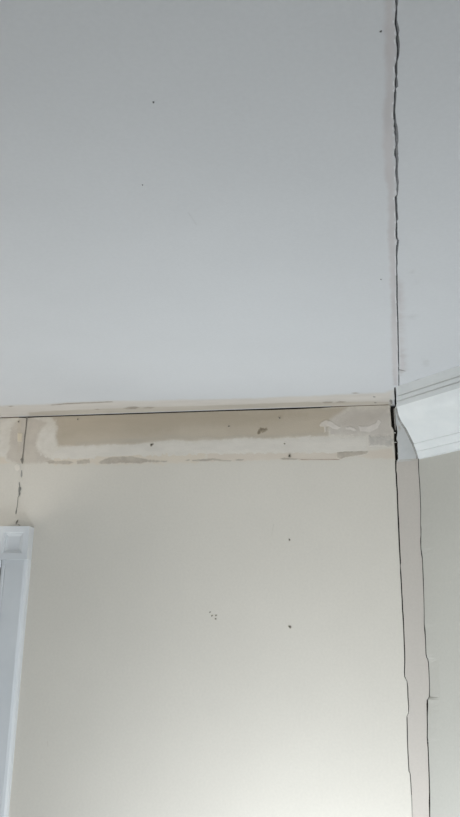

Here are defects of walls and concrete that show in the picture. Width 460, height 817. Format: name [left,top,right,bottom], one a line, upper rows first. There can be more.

crack [0,405,375,525]
crack [389,0,430,817]